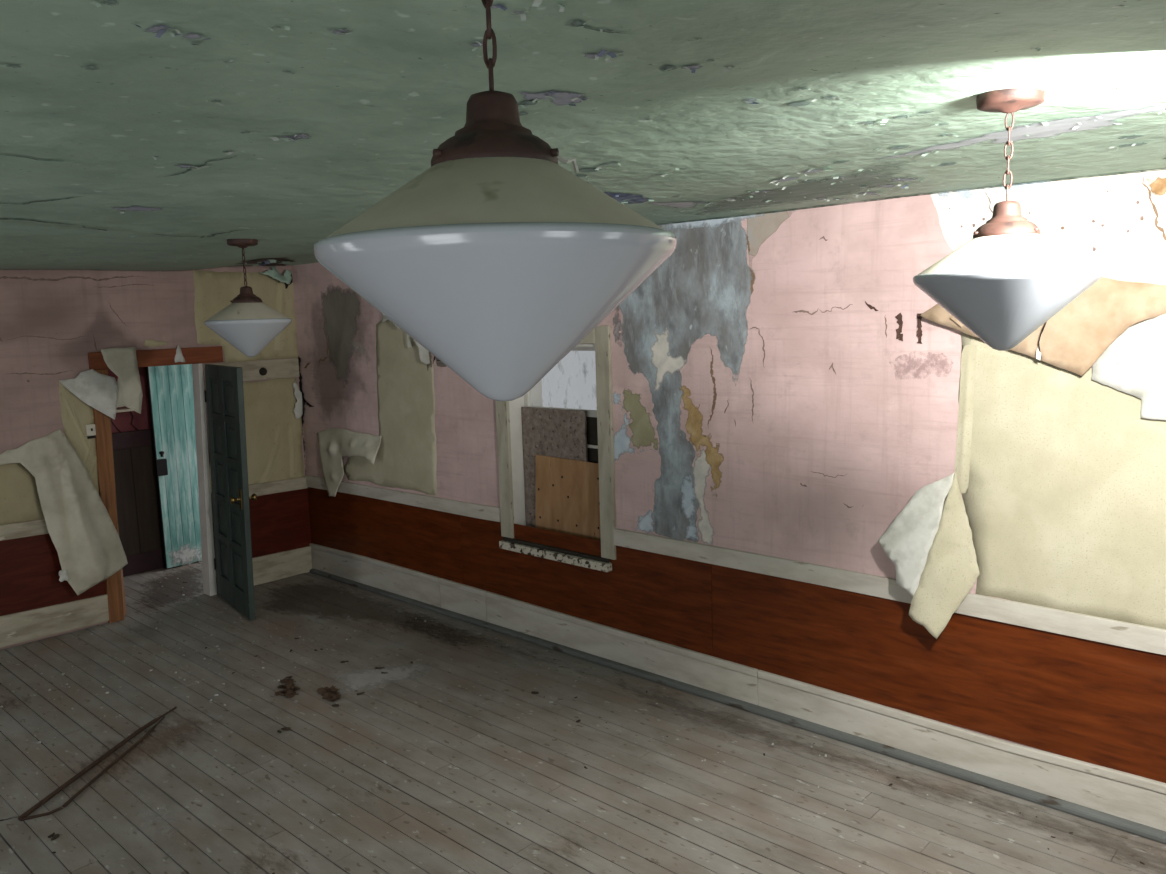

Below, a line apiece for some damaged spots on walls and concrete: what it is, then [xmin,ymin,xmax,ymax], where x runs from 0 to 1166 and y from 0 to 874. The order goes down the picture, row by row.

peeling [850,106,1166,166]
crack [0,196,107,231]
peeling [604,192,654,205]
crack [661,169,1166,241]
peeling [60,347,143,420]
water stain [304,287,364,381]
peeling [613,161,850,542]
peeling [920,304,979,338]
spalling [930,158,1166,420]
peeling [318,428,382,497]
peeling [0,429,128,595]
peeling [878,472,980,639]